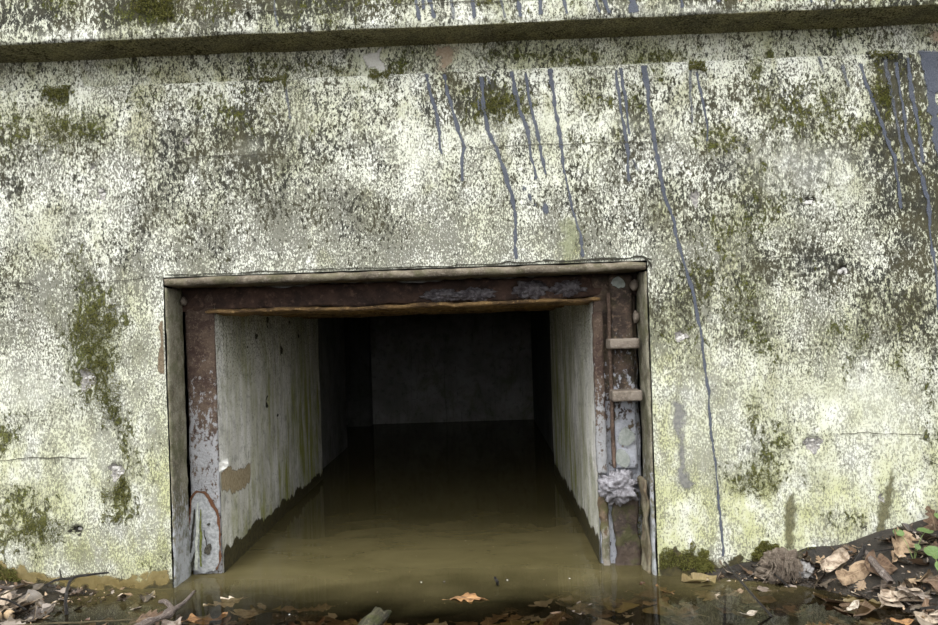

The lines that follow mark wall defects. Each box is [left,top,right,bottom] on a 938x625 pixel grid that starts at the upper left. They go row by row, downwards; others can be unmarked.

leakage [414,0,436,20]
leakage [425,74,443,154]
leakage [443,74,466,181]
leakage [477,76,518,259]
leakage [510,71,547,180]
leakage [547,68,585,257]
leakage [859,50,938,311]
rust [419,287,498,303]
rust [511,279,588,300]
leakage [641,65,761,576]
crack [0,454,84,462]
rust [597,468,640,507]